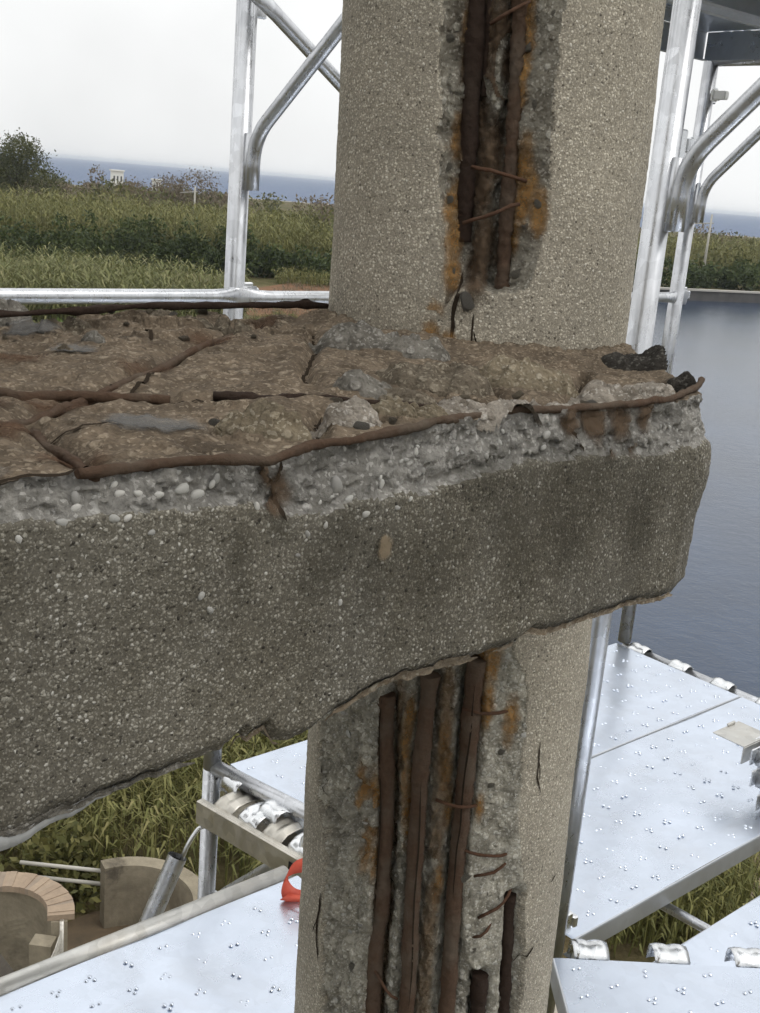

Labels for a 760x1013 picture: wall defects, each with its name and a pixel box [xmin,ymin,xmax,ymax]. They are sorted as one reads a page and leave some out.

corrosion [444,0,534,297]
spalling [434,0,567,312]
corrosion [511,137,547,251]
peeling [7,318,54,336]
crack [0,353,220,484]
crack [259,461,287,521]
spalling [0,394,710,544]
corrosion [560,403,654,454]
corrosion [474,648,499,728]
corrosion [417,675,453,1013]
spalling [317,592,673,1013]
corrosion [380,887,393,1011]